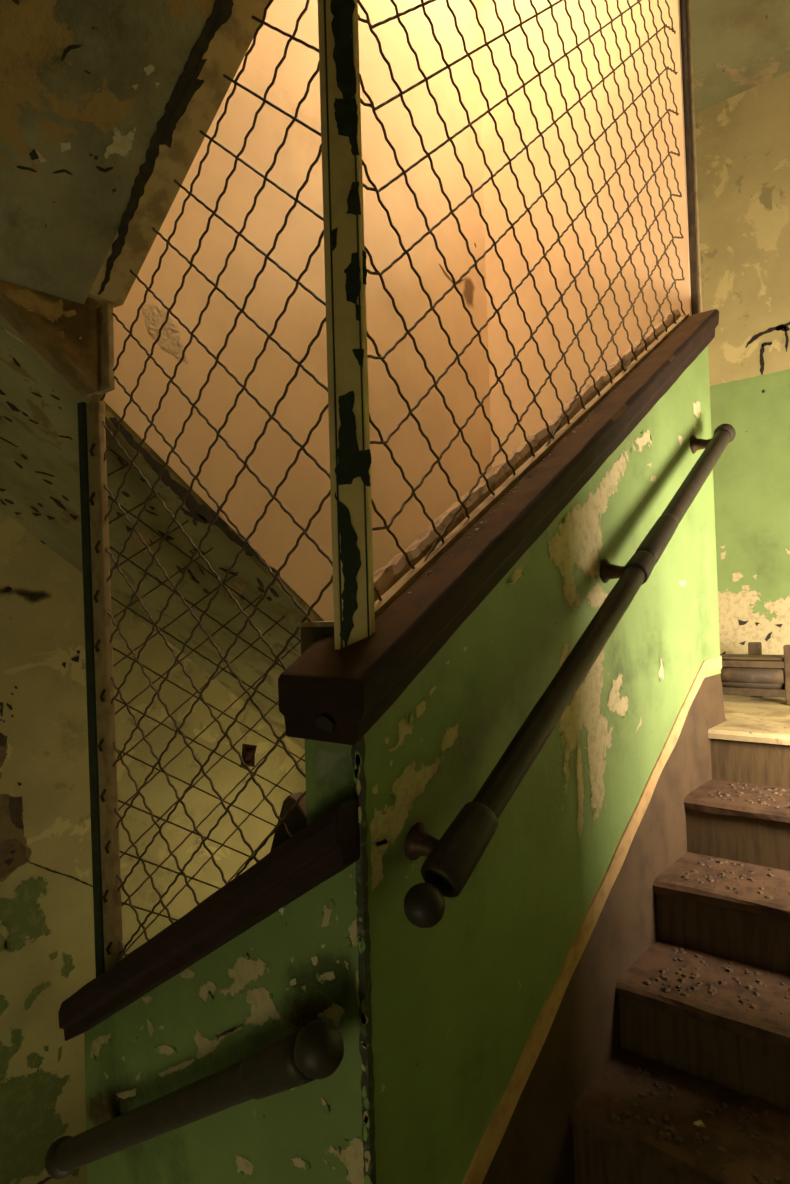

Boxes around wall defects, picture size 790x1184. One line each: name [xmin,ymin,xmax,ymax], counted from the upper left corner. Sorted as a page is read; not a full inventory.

peeling [718,572,790,655]
flaking render [0,686,17,779]
flaking render [0,782,31,882]
peeling [369,686,460,892]
peeling [558,647,642,838]
peeling [140,953,281,1077]
peeling [286,900,360,1027]